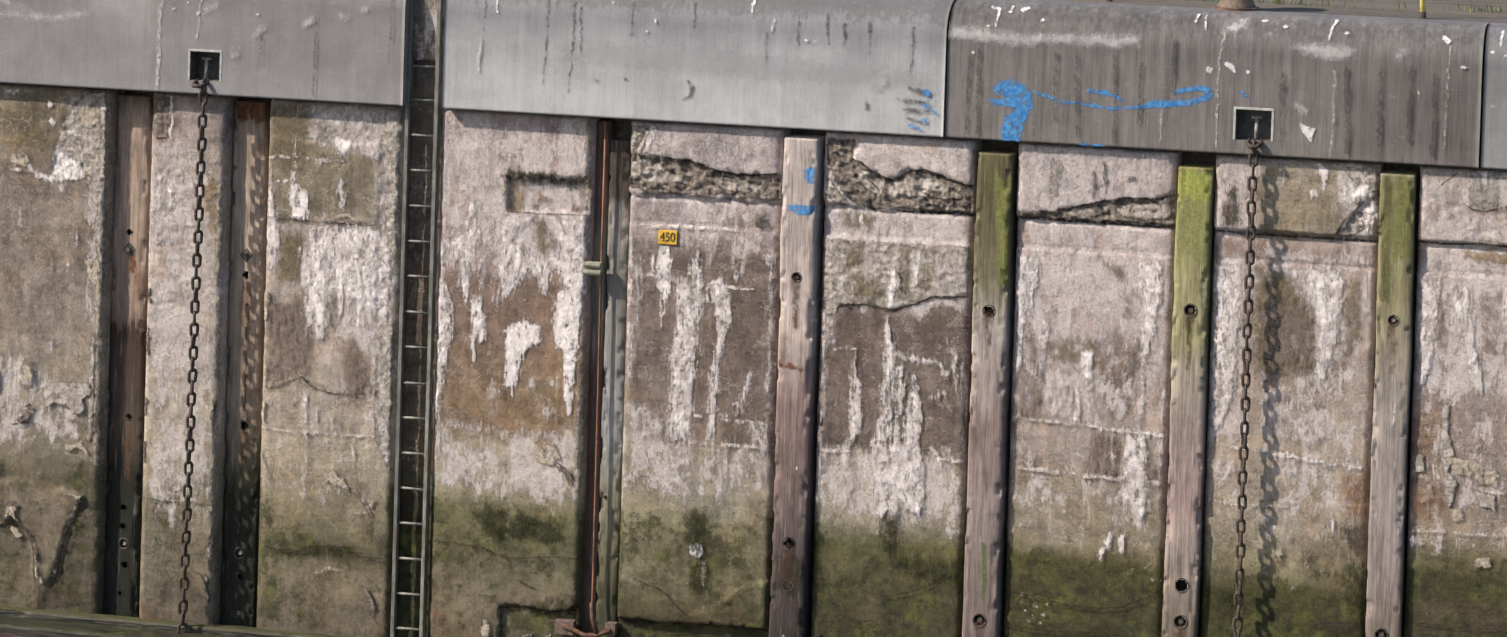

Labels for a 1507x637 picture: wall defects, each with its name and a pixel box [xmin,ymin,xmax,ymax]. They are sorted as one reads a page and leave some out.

spalling [629,126,781,201]
spalling [826,138,975,216]
spalling [1018,195,1176,228]
damp [434,116,591,467]
damp [627,210,778,500]
damp [816,312,968,535]
damp [1214,403,1361,508]
peeling [0,493,81,608]
damp [688,514,710,595]
damp [480,620,490,637]